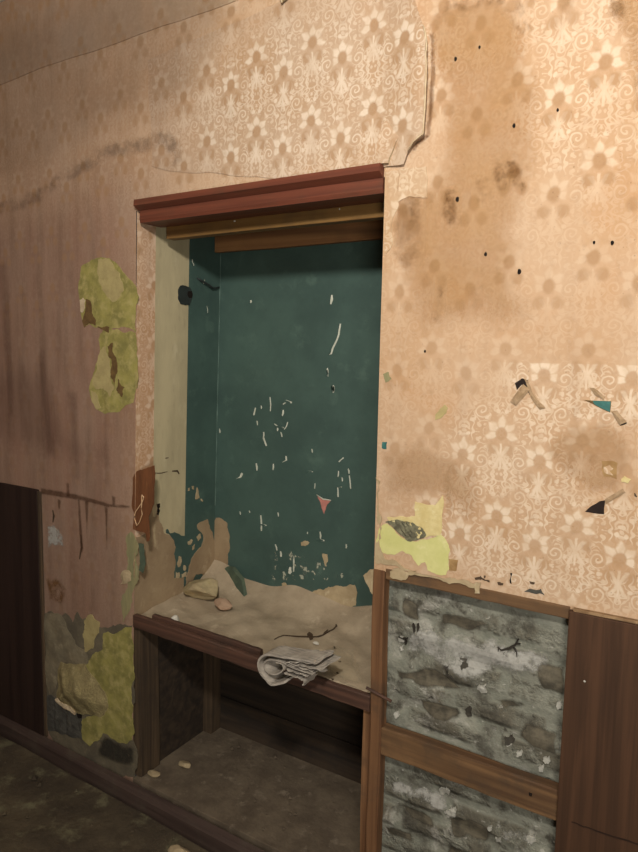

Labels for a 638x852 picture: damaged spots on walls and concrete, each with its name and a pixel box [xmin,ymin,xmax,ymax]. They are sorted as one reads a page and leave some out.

peeling [78,257,139,414]
flaking render [44,503,232,778]
peeling [265,551,357,607]
peeling [376,496,450,575]